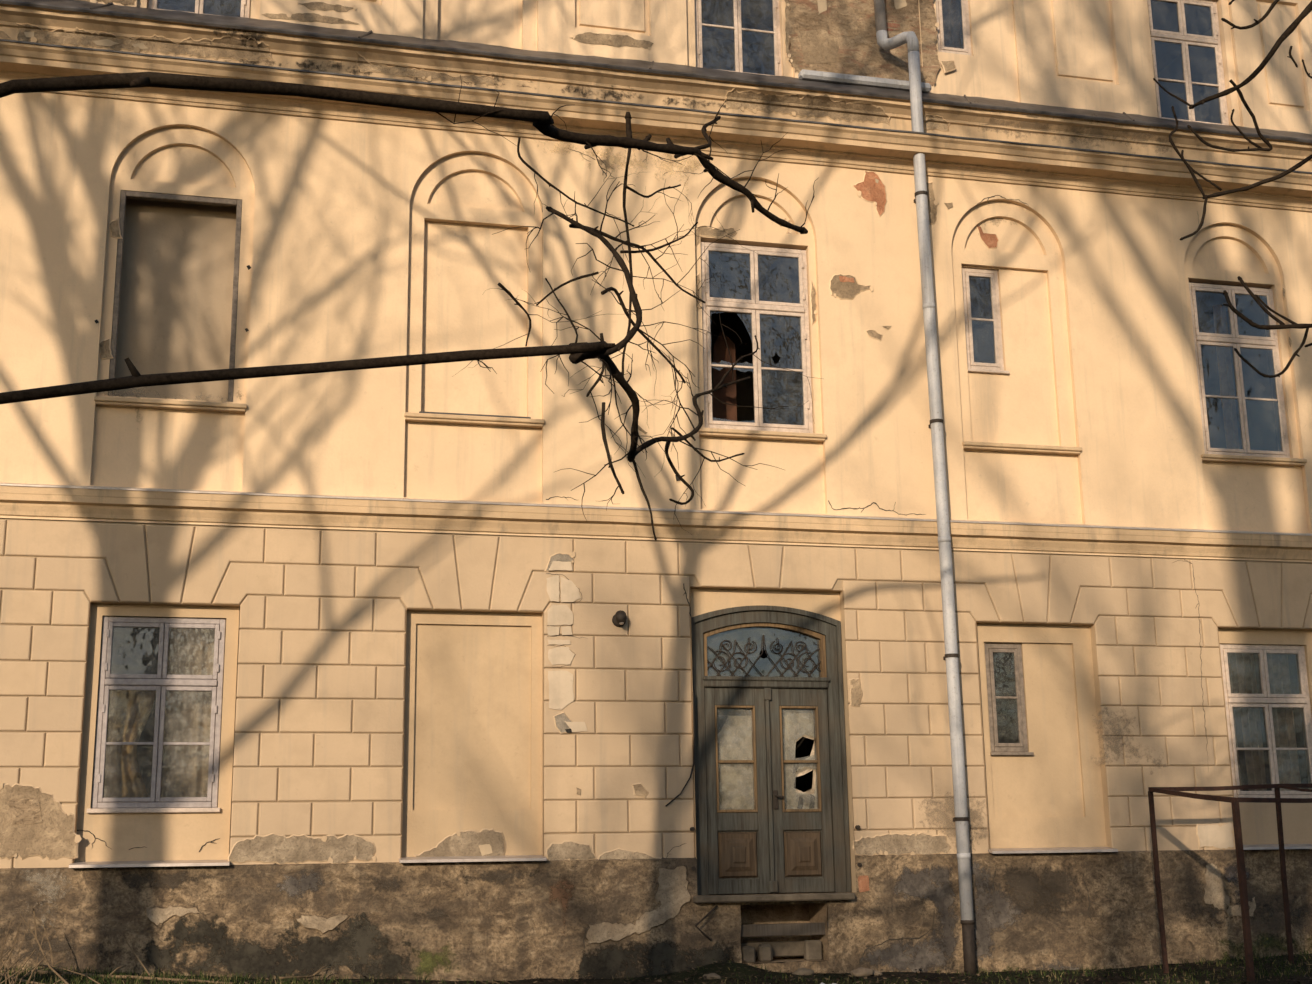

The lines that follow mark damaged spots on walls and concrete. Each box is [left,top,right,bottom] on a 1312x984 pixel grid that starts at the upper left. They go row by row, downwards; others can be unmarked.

peeling [572,32,654,49]
spalling [785,0,956,86]
spalling [809,273,874,326]
crack [828,501,926,515]
peeling [545,551,587,734]
spalling [0,782,82,860]
water stain [0,919,118,967]
water stain [134,912,421,980]
water stain [463,870,540,884]
water stain [861,866,958,972]
water stain [971,862,1086,961]
peeling [1196,821,1257,918]